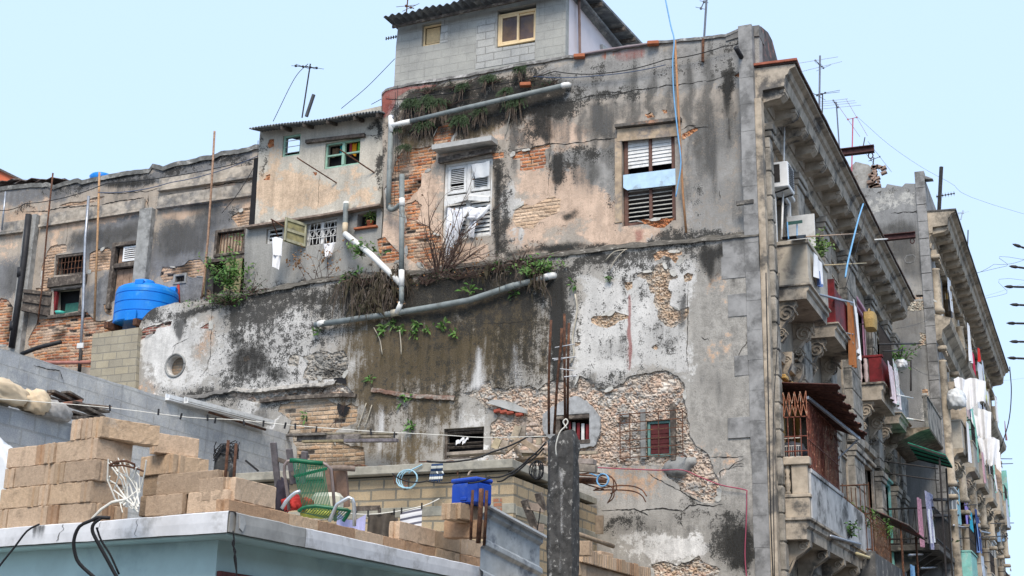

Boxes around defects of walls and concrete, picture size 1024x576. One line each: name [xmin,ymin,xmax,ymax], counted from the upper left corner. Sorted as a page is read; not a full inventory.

leakage [723,71,732,110]
flaking render [378,122,456,269]
leakage [493,168,585,257]
flaking render [36,244,67,292]
flaking render [624,250,693,328]
flaking render [591,310,629,328]
leakage [230,332,286,379]
leakage [471,351,483,389]
flaking render [464,371,722,504]
crack [603,473,721,526]
flaking render [651,556,720,576]
leakage [730,527,751,569]